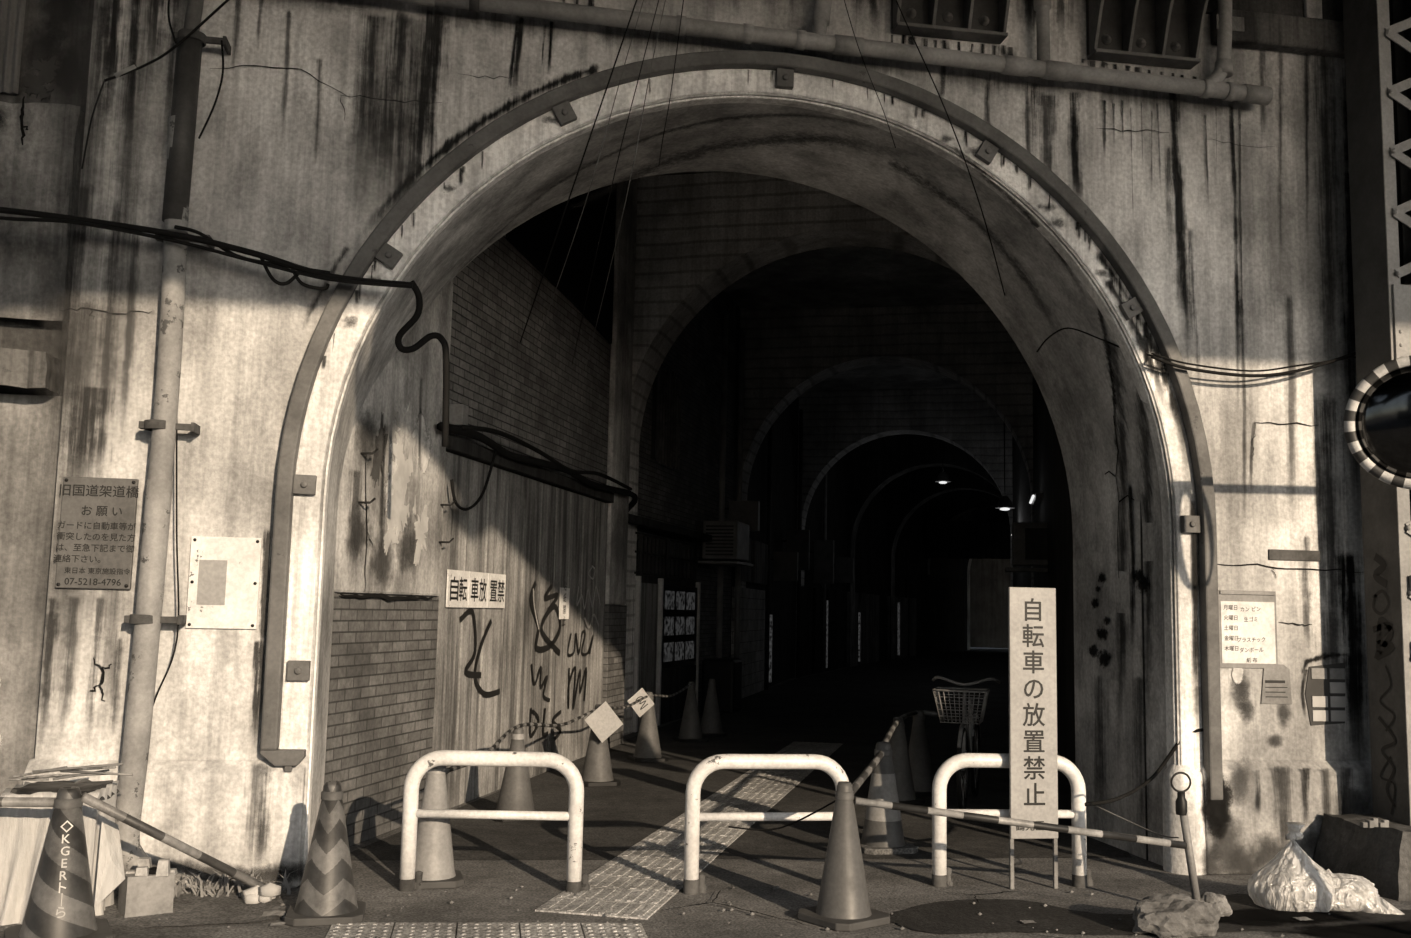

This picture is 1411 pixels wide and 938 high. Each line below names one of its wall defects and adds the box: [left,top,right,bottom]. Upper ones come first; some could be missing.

water stain [360,13,598,215]
water stain [310,248,348,313]
water stain [1204,107,1256,484]
water stain [1305,55,1356,398]
water stain [352,471,360,552]
water stain [380,425,388,535]
water stain [1302,399,1367,742]
crack [90,657,112,701]
water stain [1203,764,1351,875]